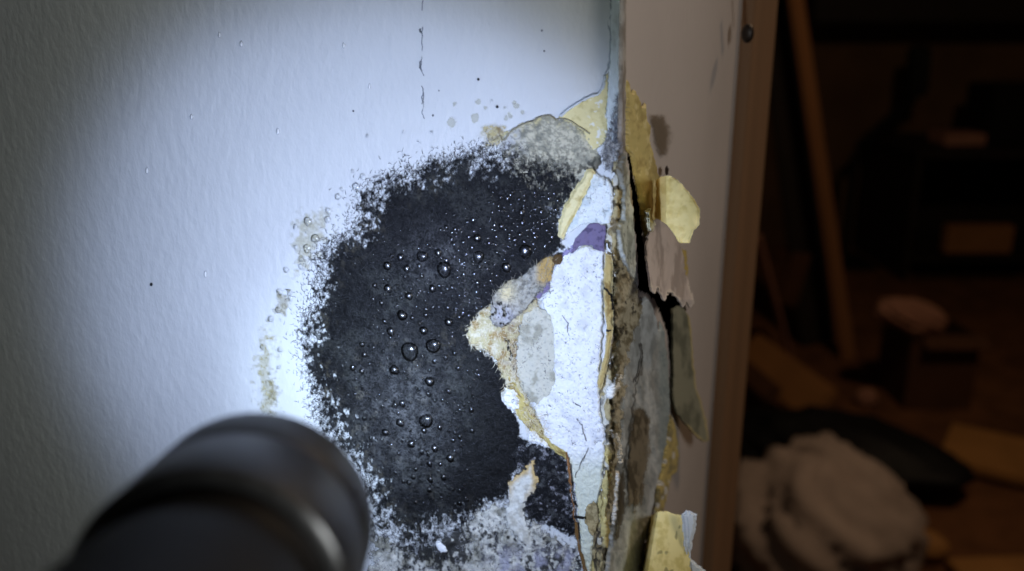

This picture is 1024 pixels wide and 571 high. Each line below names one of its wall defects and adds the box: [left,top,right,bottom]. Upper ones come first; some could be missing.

crack [418,1,426,119]
damp [277,97,630,571]
flaking render [505,460,539,553]
flaking render [516,72,706,571]